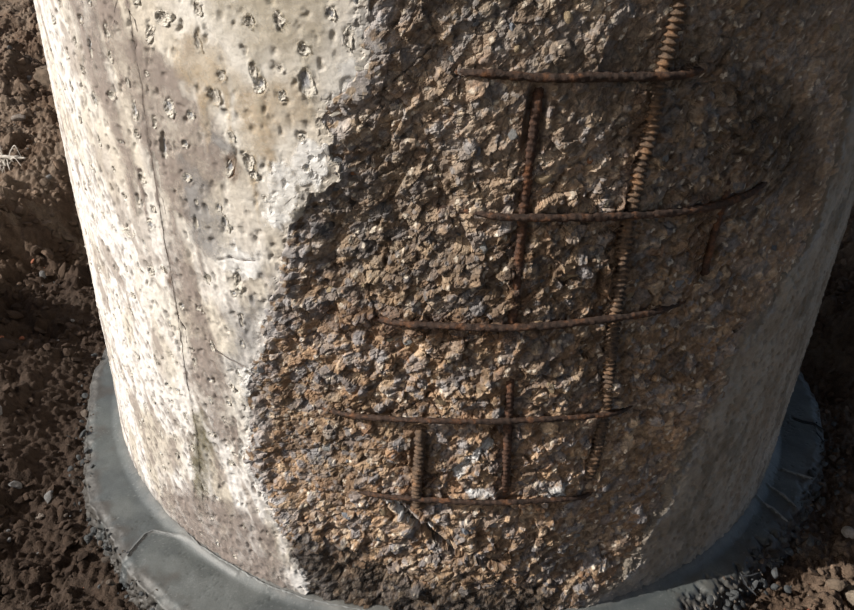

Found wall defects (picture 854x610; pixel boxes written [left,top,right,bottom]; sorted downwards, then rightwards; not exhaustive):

spalling [63,329,158,610]
crack [114,0,208,500]
spalling [225,0,854,610]